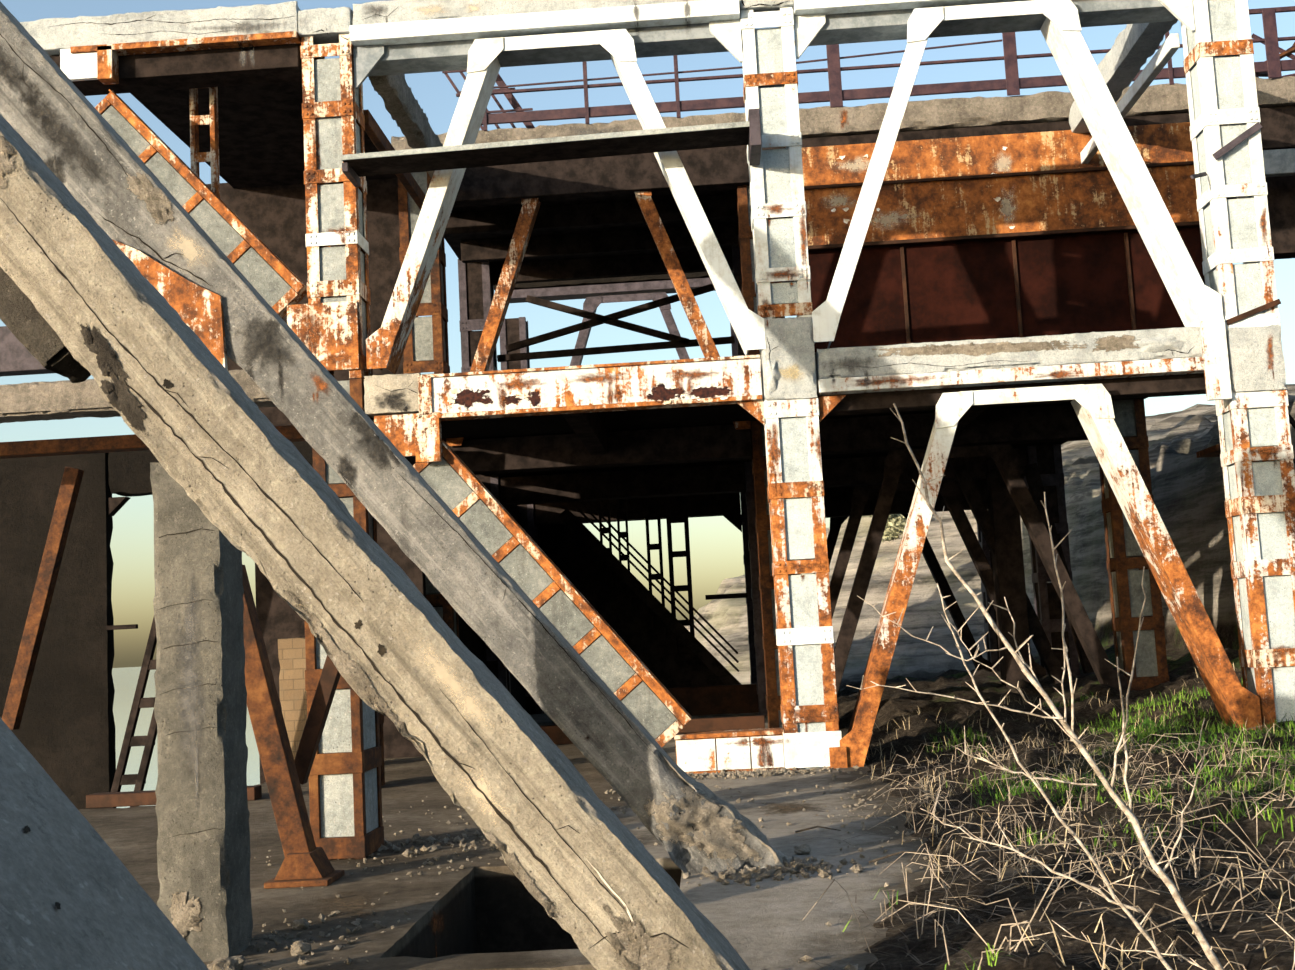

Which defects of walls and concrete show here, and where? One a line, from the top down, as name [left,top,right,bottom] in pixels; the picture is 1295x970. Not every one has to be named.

corrosion [312,126,320,194]
corrosion [329,227,355,246]
corrosion [303,315,351,363]
corrosion [499,379,537,408]
corrosion [580,373,623,404]
corrosion [667,370,712,399]
corrosion [768,425,779,489]
corrosion [1252,447,1280,466]
crack [2,200,688,960]
corrosion [791,563,824,579]
corrosion [1273,646,1295,668]
spalling [643,786,762,866]